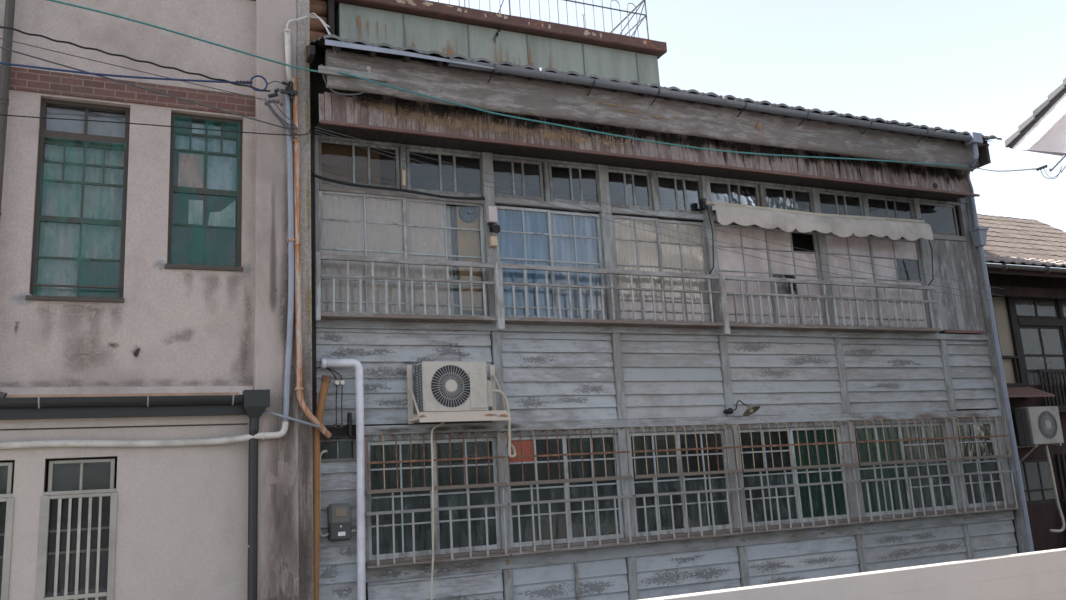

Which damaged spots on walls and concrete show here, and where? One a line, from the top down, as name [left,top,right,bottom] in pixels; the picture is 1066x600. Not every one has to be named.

damp [356,93,962,186]
damp [270,242,313,600]
rust [364,414,1011,490]